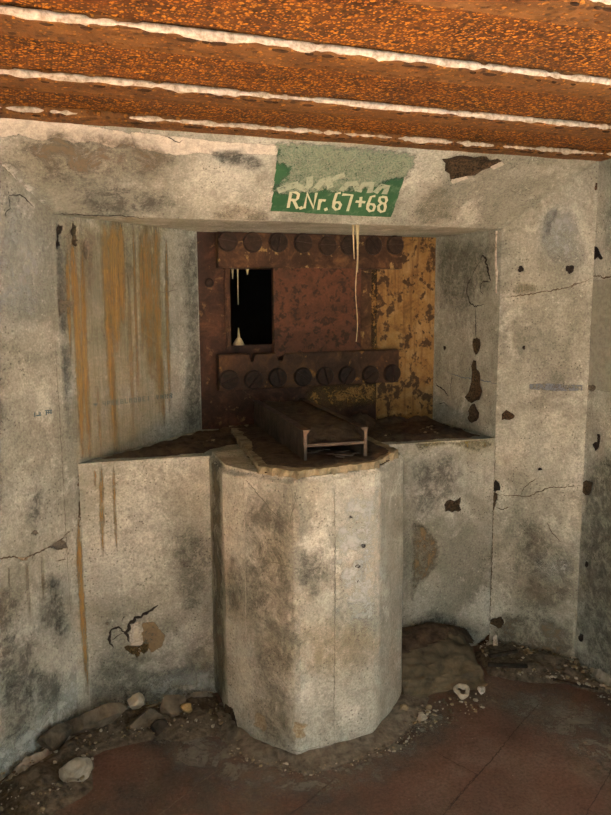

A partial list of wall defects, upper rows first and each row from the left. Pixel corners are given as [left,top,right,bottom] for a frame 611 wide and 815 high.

rust [176,37,227,46]
spalling [442,155,505,184]
rust [102,221,170,446]
spalling [465,338,482,423]
damp [0,590,78,773]
crack [0,330,81,611]
rust [77,520,89,689]
crack [107,605,158,648]
damp [150,461,239,701]
spalling [444,497,461,512]
crack [489,479,573,625]
damp [582,460,611,664]